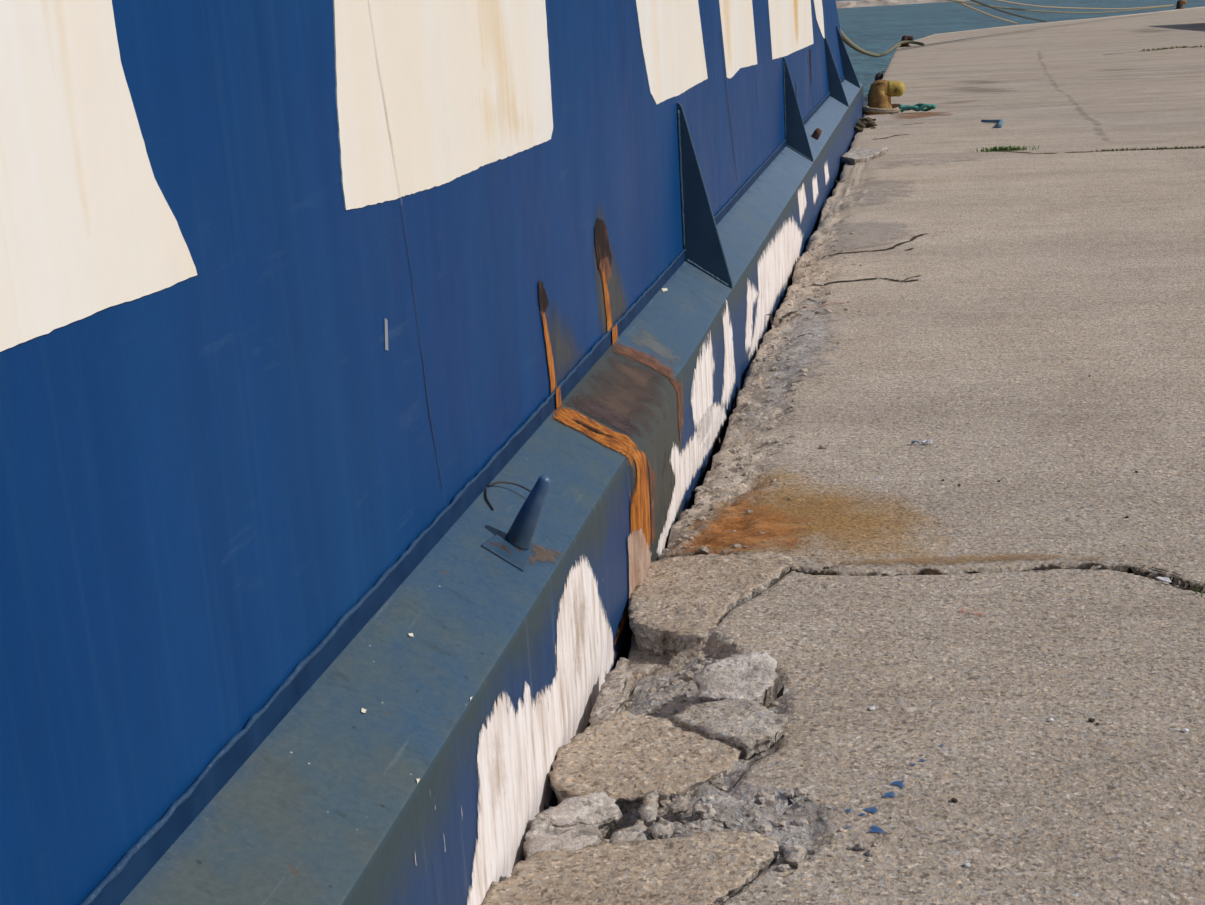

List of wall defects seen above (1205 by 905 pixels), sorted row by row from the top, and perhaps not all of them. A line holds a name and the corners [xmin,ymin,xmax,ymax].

crack [767,233,928,342]
spalling [739,296,837,437]
corrosion [687,485,803,555]
corrosion [862,554,1057,564]
crack [760,562,1205,594]
spalling [624,657,714,718]
spalling [767,678,792,716]
spalling [604,745,830,850]